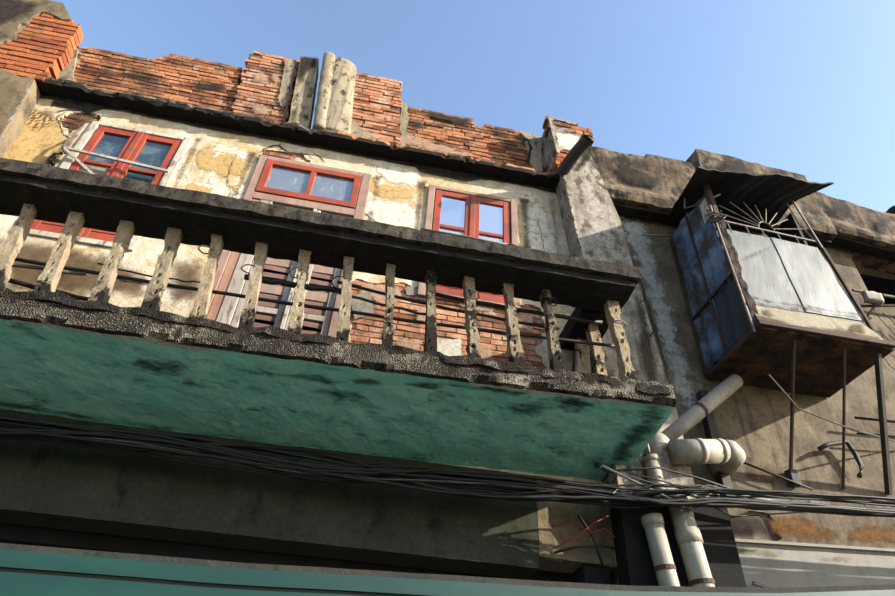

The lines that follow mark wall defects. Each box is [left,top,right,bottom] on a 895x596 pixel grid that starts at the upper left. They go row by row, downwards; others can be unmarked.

flaking render [0,13,84,82]
peeling [3,109,100,166]
peeling [177,144,310,199]
peeling [364,163,421,230]
crack [562,175,583,254]
leakage [722,159,750,173]
leakage [833,203,852,219]
flaking render [350,280,467,356]
flaking render [476,309,508,362]
leakage [636,296,656,381]
corrosion [770,516,837,540]
corrosion [849,526,895,543]